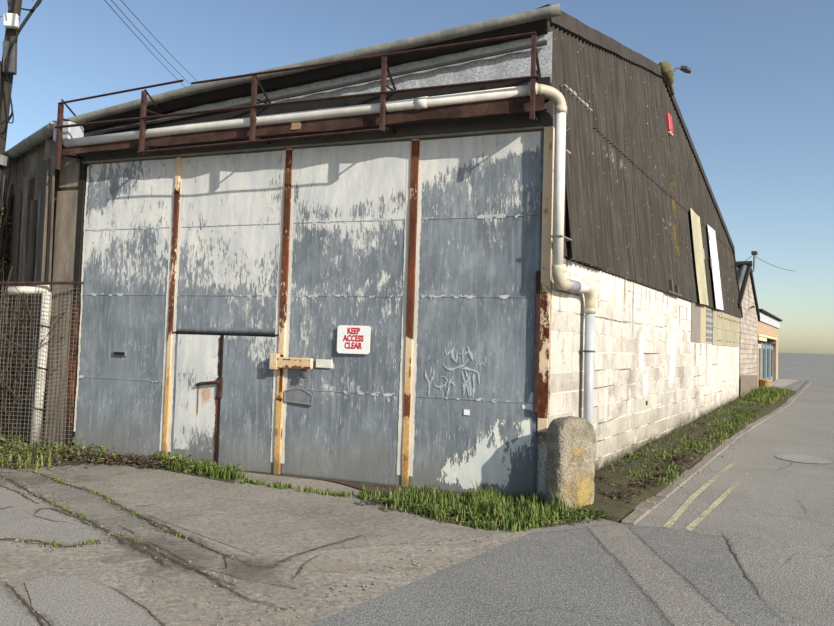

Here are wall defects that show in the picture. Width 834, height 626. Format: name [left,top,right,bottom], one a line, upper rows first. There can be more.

peeling [84,159,173,295]
corrosion [167,180,181,340]
corrosion [279,150,293,332]
peeling [173,141,409,452]
corrosion [406,140,420,339]
peeling [421,131,541,228]
damp [637,331,648,398]
damp [666,336,676,391]
peeling [437,392,536,491]
crack [3,581,44,626]
crack [102,583,165,626]
crack [0,471,360,610]